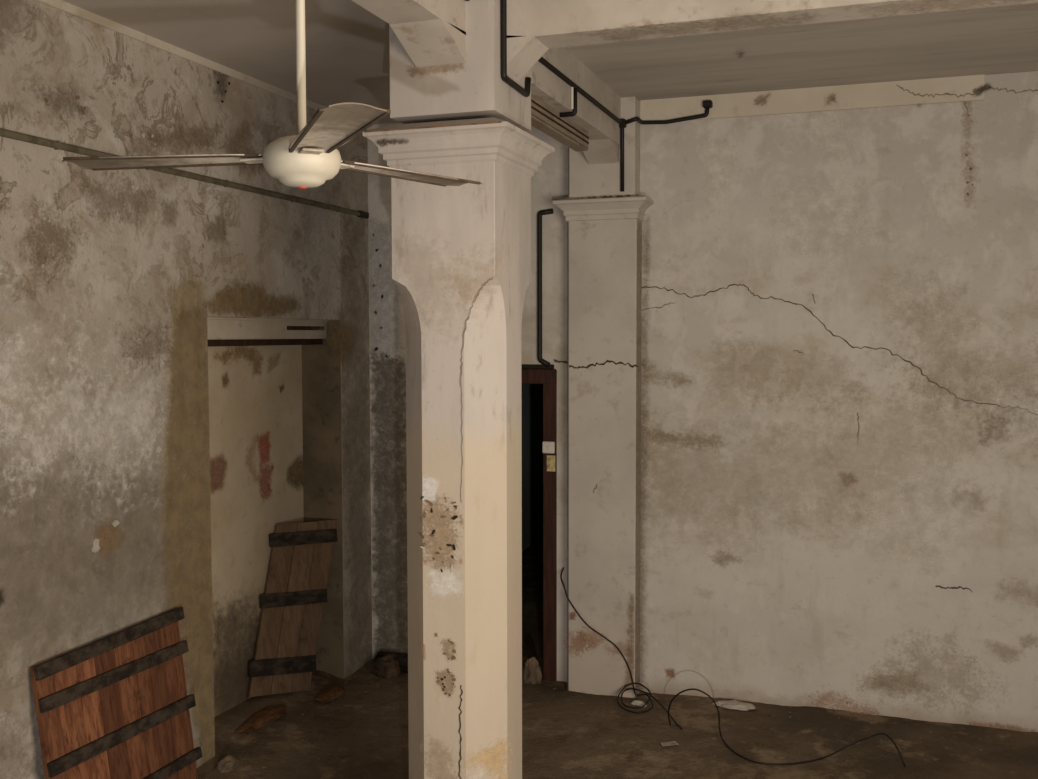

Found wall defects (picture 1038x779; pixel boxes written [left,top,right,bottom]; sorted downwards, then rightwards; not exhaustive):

crack [896,85,1038,114]
leakage [208,285,296,317]
crack [554,359,638,369]
crack [642,284,1037,415]
leakage [0,314,178,505]
flaking render [210,458,226,491]
flaking render [259,433,274,498]
peeling [418,477,461,595]
crack [935,585,973,593]
flaking render [437,640,456,696]
crack [456,685,464,779]